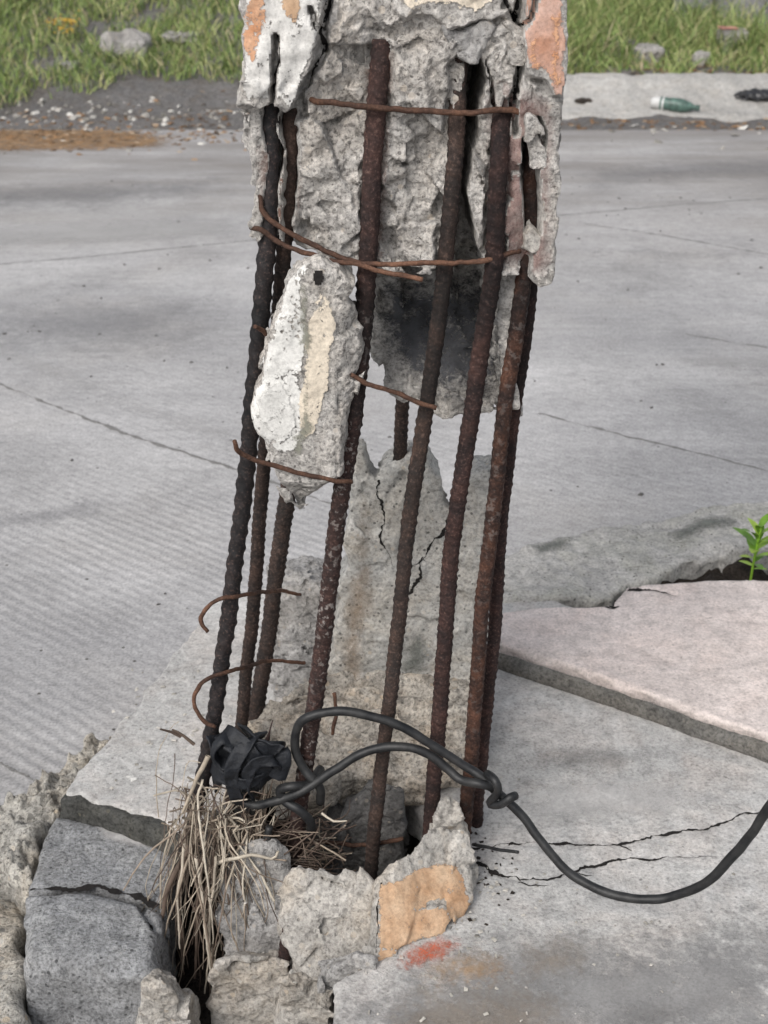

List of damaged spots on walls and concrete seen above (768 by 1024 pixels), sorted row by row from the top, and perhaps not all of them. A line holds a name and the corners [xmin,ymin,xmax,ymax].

rust [502,98,538,264]
spalling [0,0,566,961]
crack [376,480,447,595]
crack [471,812,759,886]
crack [30,884,160,932]
spalling [278,928,291,970]